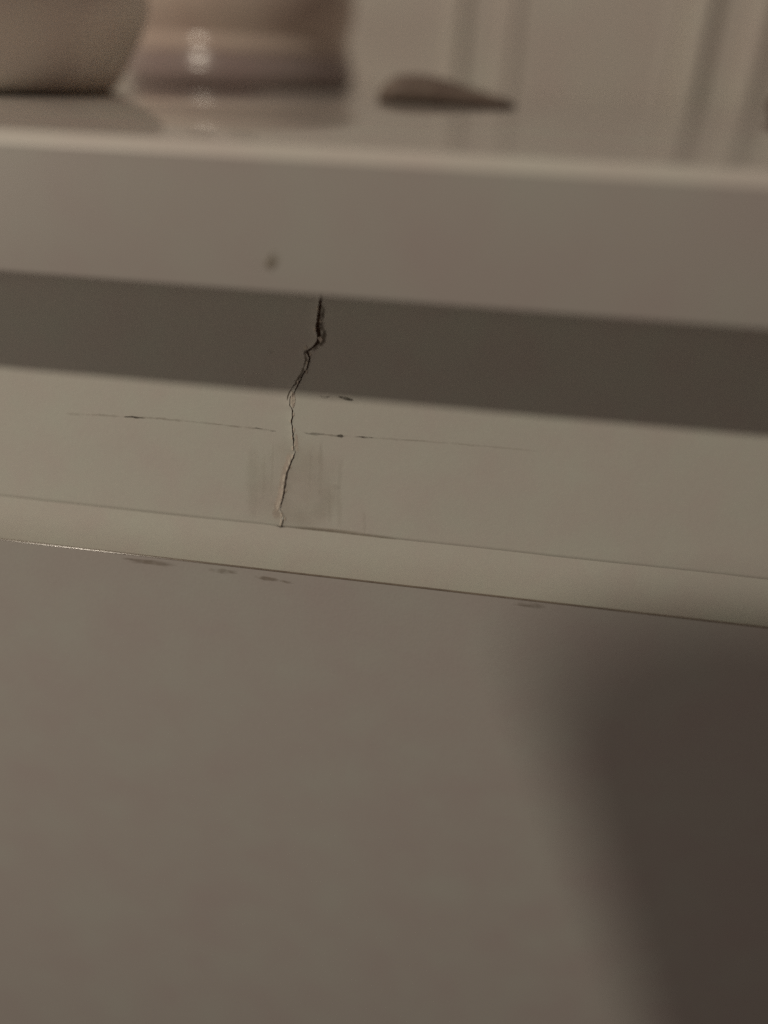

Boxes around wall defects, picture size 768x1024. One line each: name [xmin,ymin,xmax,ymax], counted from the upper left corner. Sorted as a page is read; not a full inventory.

crack [274,297,325,527]